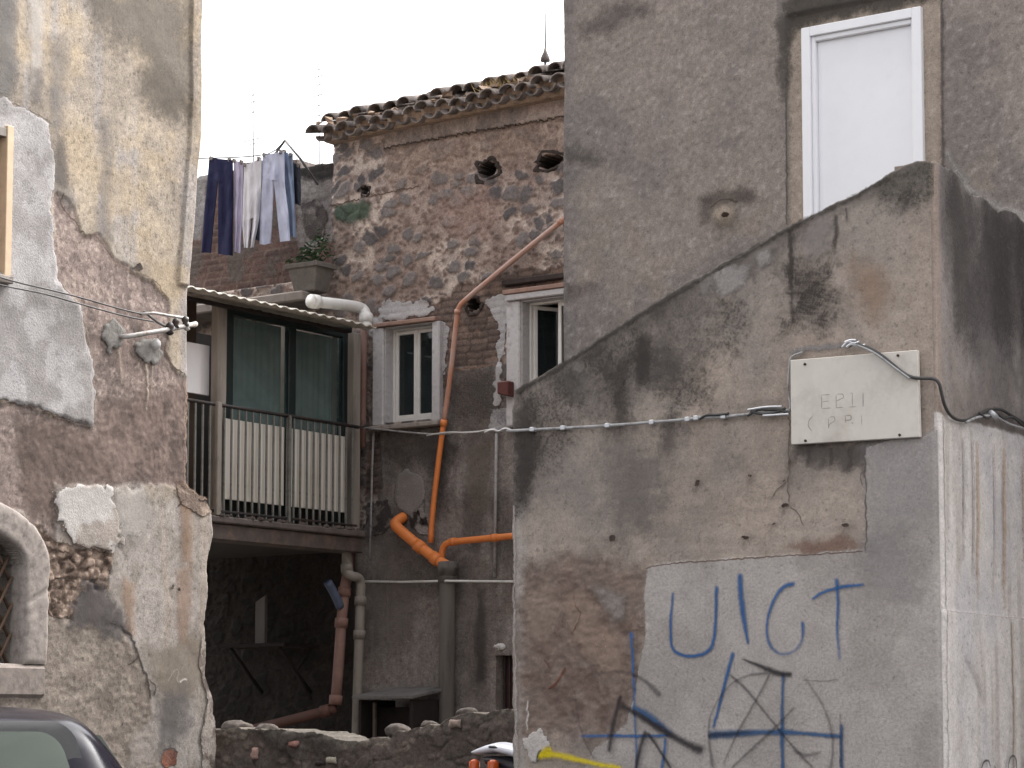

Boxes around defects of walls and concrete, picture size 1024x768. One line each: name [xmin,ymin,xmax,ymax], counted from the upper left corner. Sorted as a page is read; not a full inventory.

leakage [701,186,753,208]
peeling [0,96,96,428]
peeling [38,484,152,621]
spalling [176,380,212,517]
peeling [369,298,435,350]
peeling [464,294,512,430]
leakage [451,290,746,519]
crack [646,448,868,569]
crack [773,418,803,524]
leakage [781,223,838,327]
leakage [795,439,895,471]
crack [110,622,156,699]